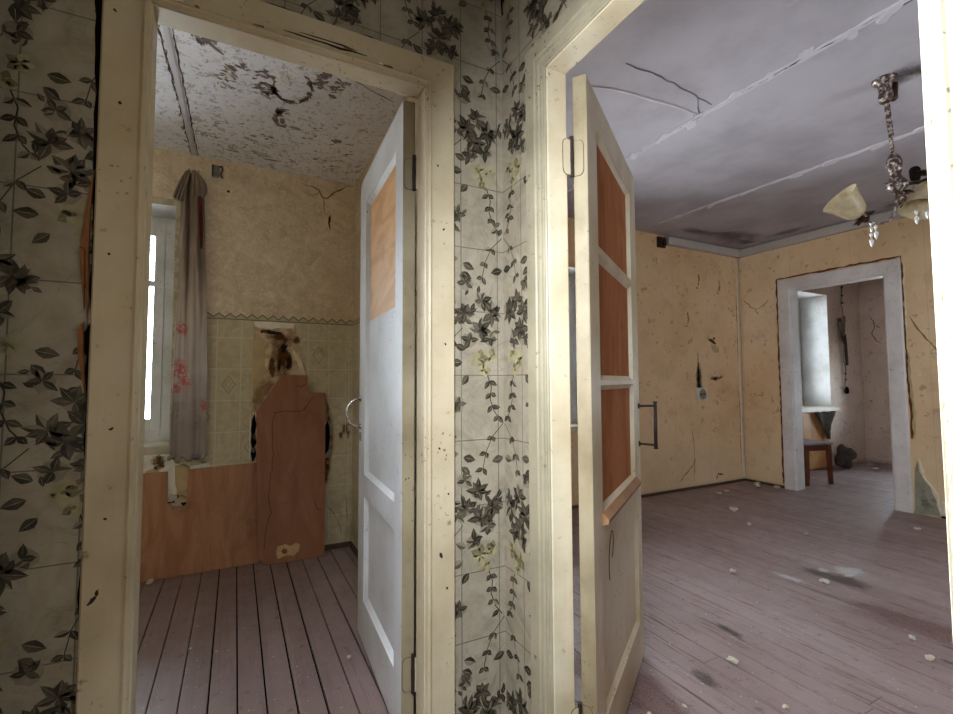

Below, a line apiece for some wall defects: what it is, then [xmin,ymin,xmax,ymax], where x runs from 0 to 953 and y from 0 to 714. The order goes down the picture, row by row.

crack [592,0,912,160]
crack [302,183,351,229]
flaking render [250,322,307,419]
crack [680,256,937,483]